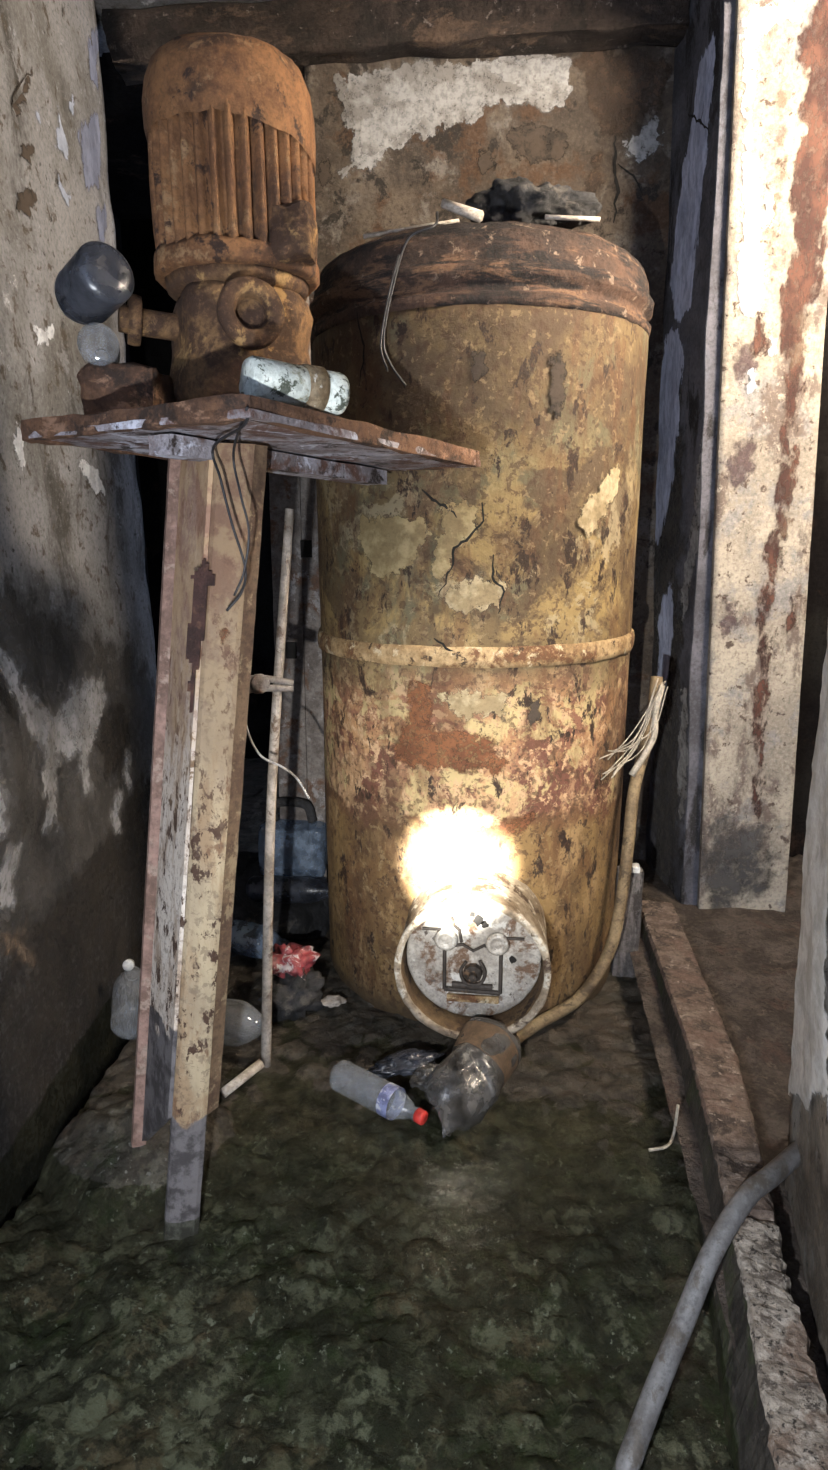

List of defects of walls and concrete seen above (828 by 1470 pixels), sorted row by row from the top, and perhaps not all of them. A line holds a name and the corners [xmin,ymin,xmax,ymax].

peeling [736,1,806,317]
peeling [746,367,758,397]
peeling [768,336,779,357]
corrosion [750,0,828,819]